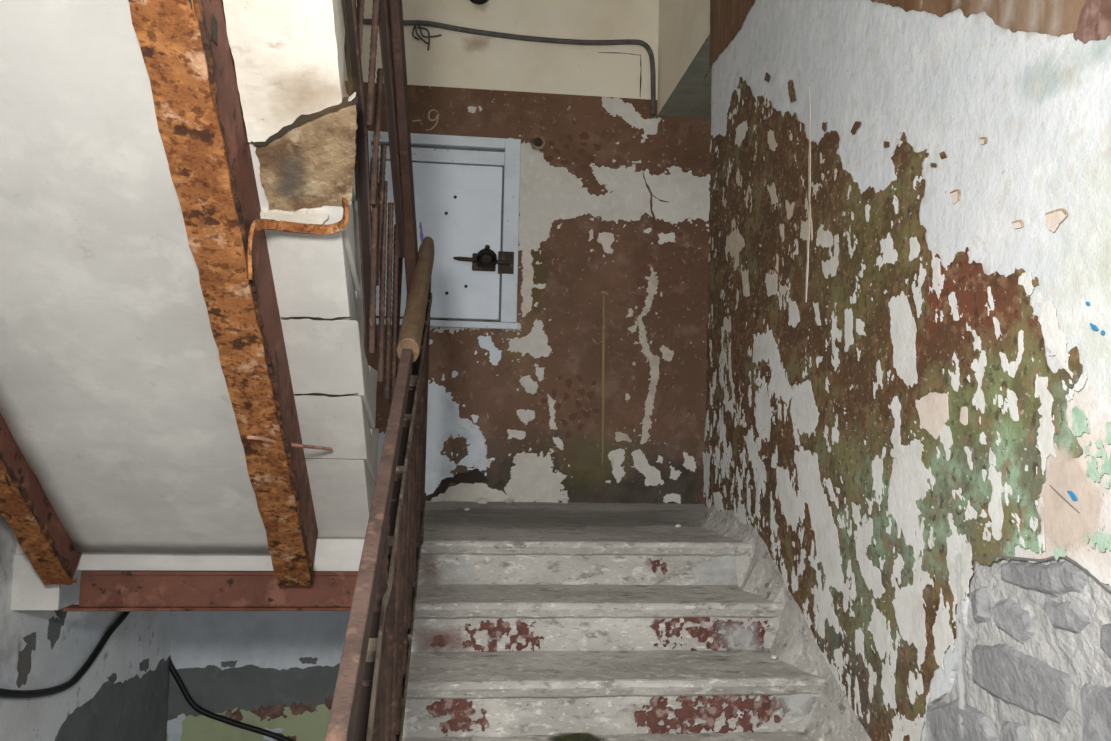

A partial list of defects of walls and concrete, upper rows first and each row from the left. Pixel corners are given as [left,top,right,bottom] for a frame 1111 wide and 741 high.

peeling [704,0,755,79]
peeling [871,0,1111,44]
spalling [255,104,358,224]
rust [194,0,314,582]
peeling [425,72,1111,741]
rust [0,449,77,583]
spalling [16,607,67,688]